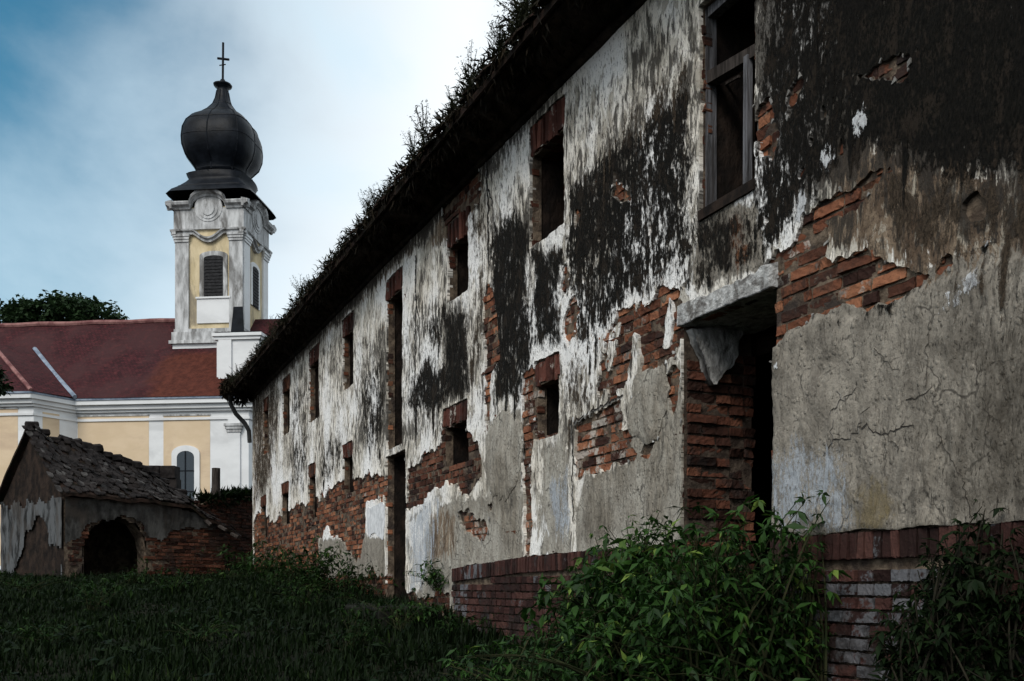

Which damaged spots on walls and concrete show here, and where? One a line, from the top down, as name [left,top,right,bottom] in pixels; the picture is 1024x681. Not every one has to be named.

spalling [752,72,804,160]
spalling [858,53,912,85]
damp [407,0,1024,537]
spalling [768,168,953,345]
spalling [388,284,500,511]
spalling [572,280,763,477]
crack [823,317,972,520]
spalling [254,467,393,599]
spalling [457,505,493,544]